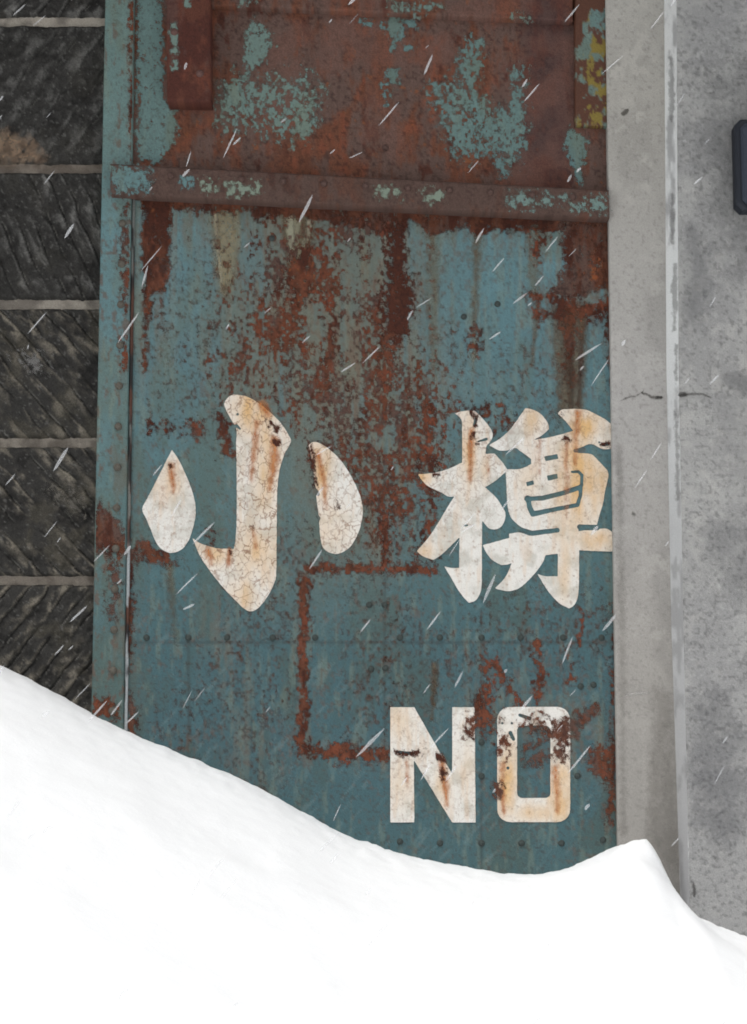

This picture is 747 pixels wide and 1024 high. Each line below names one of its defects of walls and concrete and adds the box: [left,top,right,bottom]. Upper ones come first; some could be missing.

peeling [358,0,446,53]
rust [125,0,134,164]
peeling [379,67,402,107]
peeling [423,32,610,217]
peeling [177,174,263,200]
peeling [374,183,405,204]
peeling [416,185,444,207]
crack [623,392,711,400]
rust [92,198,616,828]